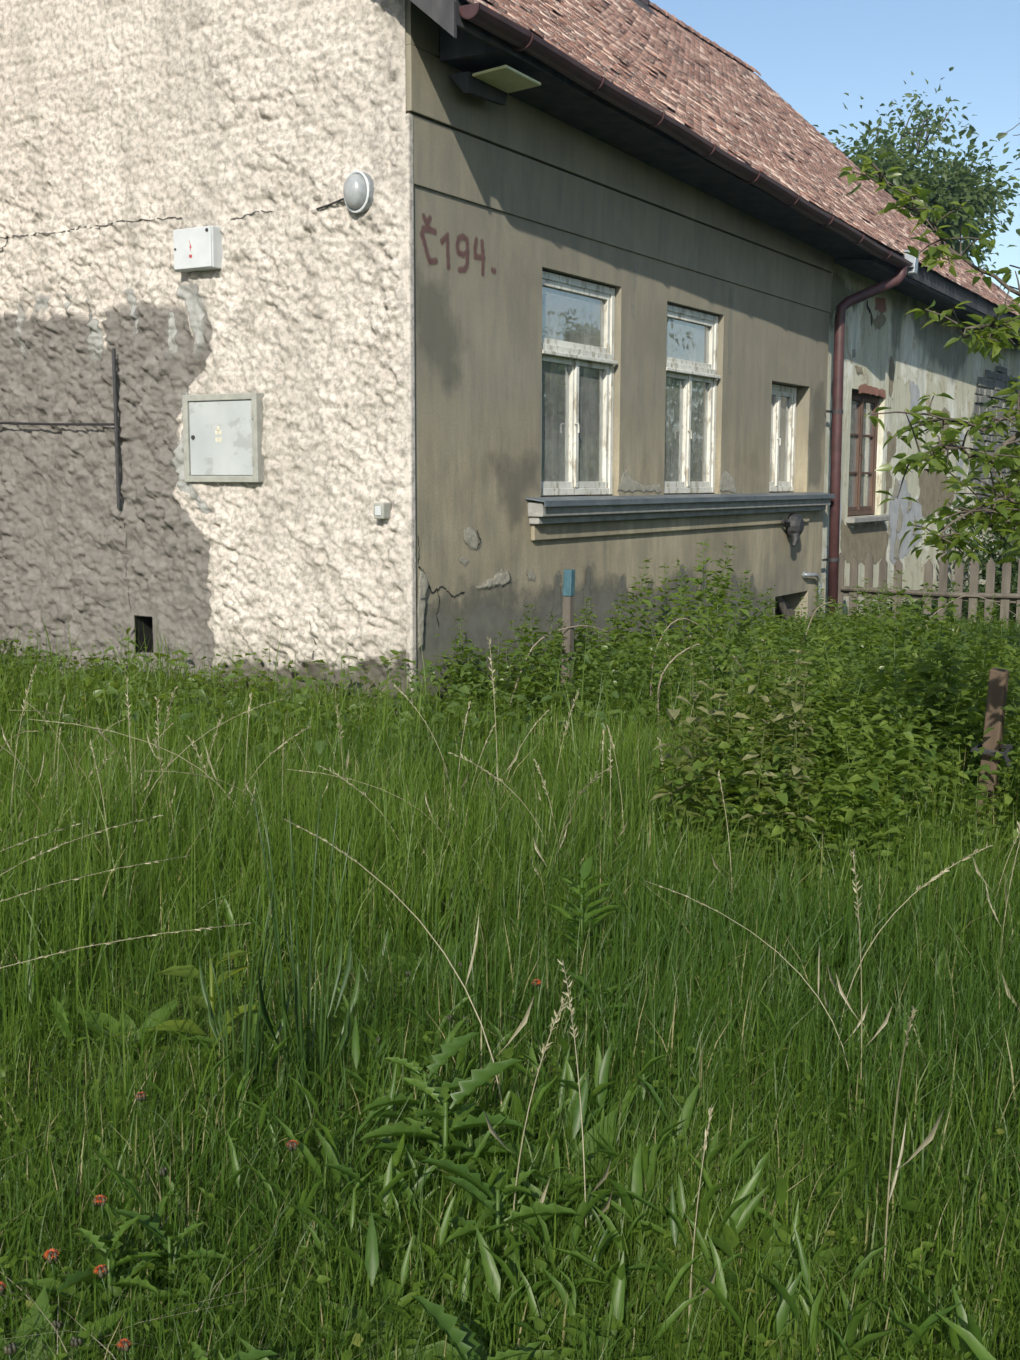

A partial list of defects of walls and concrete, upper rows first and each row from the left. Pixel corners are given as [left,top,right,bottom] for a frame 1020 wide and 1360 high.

crack [0,217,182,252]
spalling [476,569,511,589]
spalling [417,571,428,649]